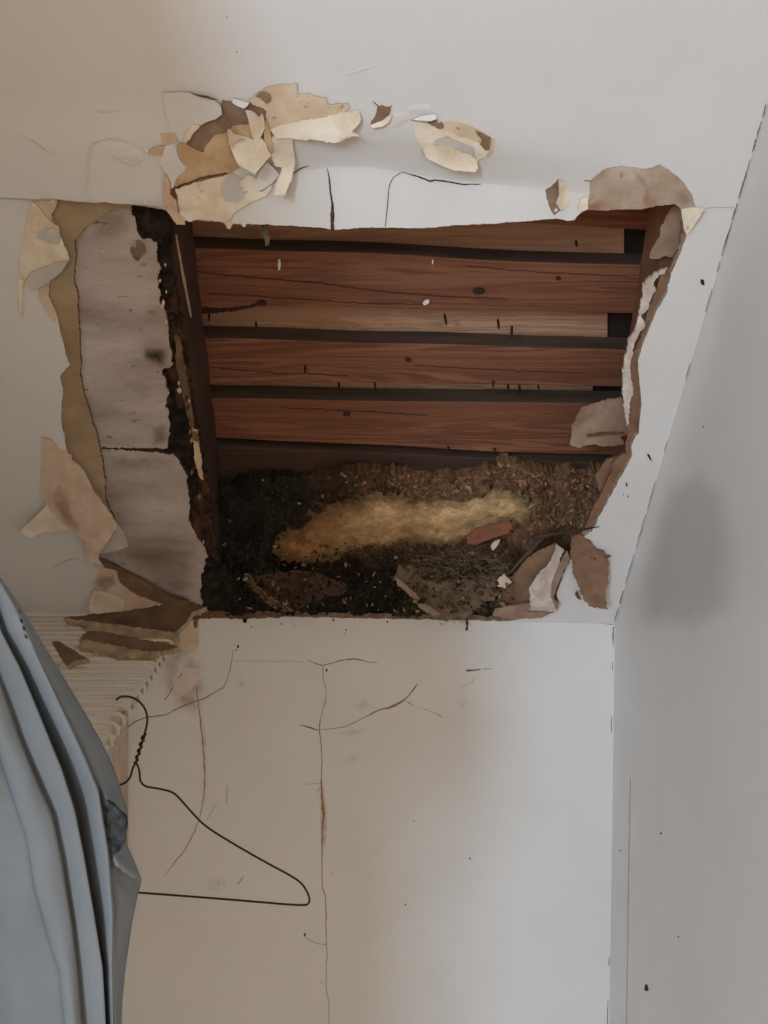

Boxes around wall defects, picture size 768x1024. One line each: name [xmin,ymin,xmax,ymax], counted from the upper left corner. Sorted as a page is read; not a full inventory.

peeling [17,199,69,322]
leakage [130,205,174,302]
peeling [148,83,393,229]
crack [293,166,335,231]
crack [385,172,479,227]
peeling [411,114,495,172]
leakage [146,351,163,363]
flaking render [545,164,704,531]
leakage [168,405,200,497]
peeling [20,437,160,614]
crack [128,653,233,875]
crack [269,658,442,1013]